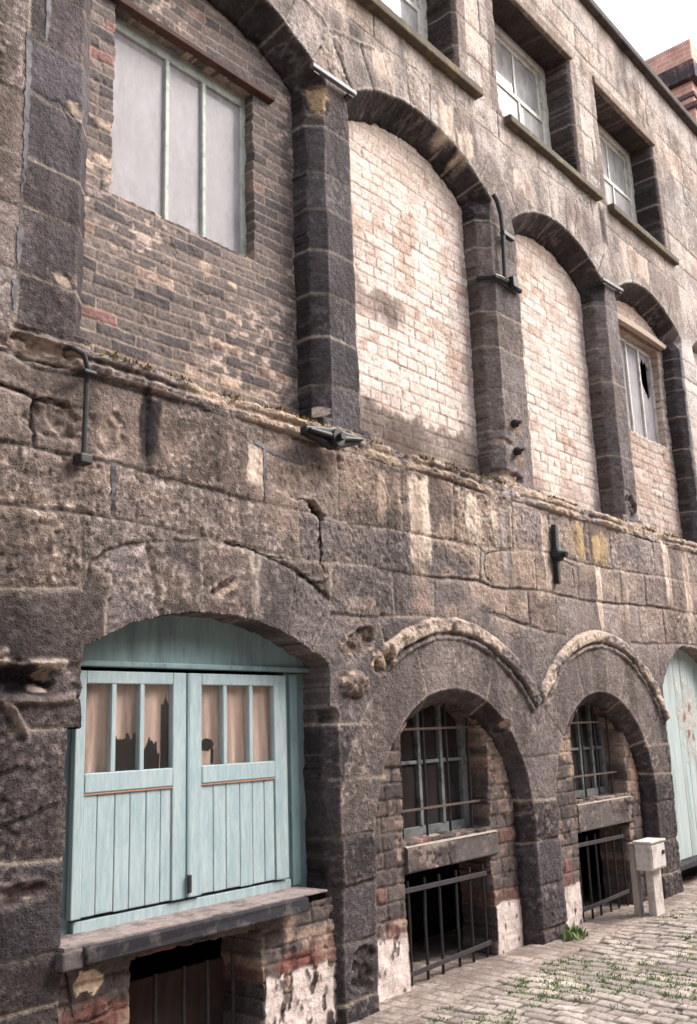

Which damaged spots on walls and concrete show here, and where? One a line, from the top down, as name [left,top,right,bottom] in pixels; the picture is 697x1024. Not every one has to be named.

crack [224,498,330,598]
peeling [497,898,524,955]
peeling [265,950,335,1024]
peeling [352,933,411,1002]